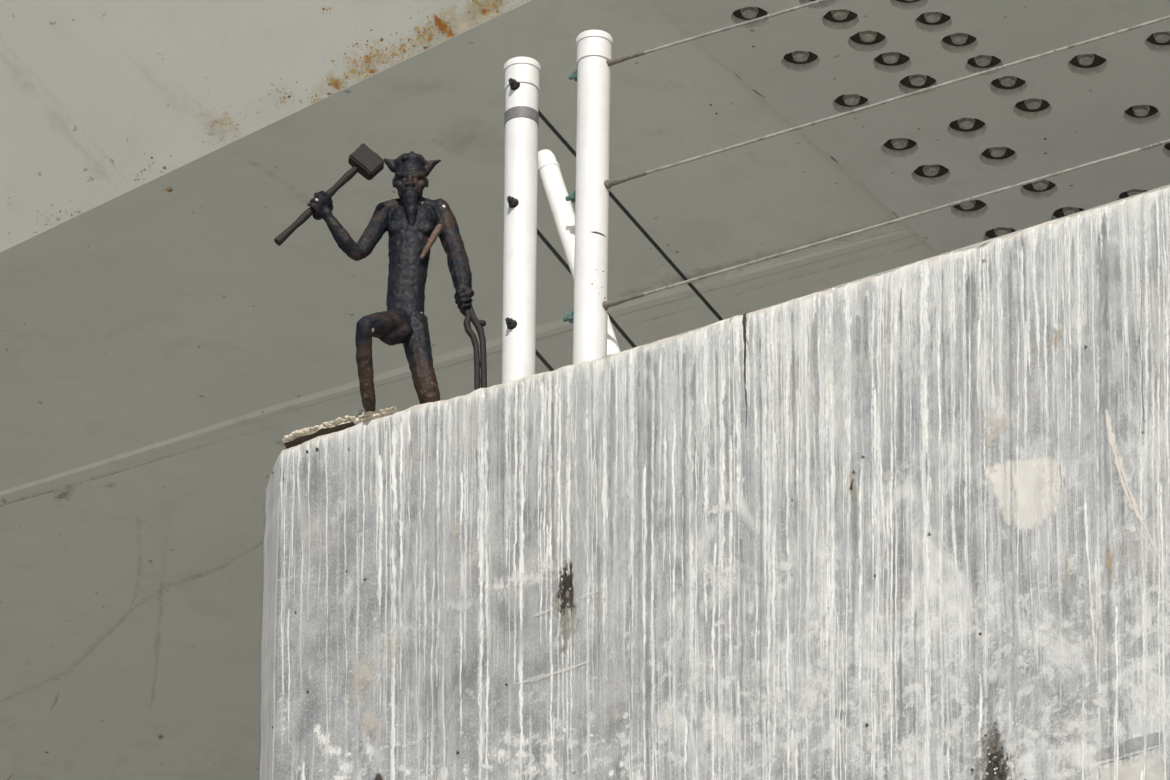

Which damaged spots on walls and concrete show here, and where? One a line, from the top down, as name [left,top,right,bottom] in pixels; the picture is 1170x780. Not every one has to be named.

rust [260,10,457,109]
water stain [344,189,1170,780]
peeling [985,455,1065,532]
water stain [280,445,310,726]
rust [556,562,575,627]